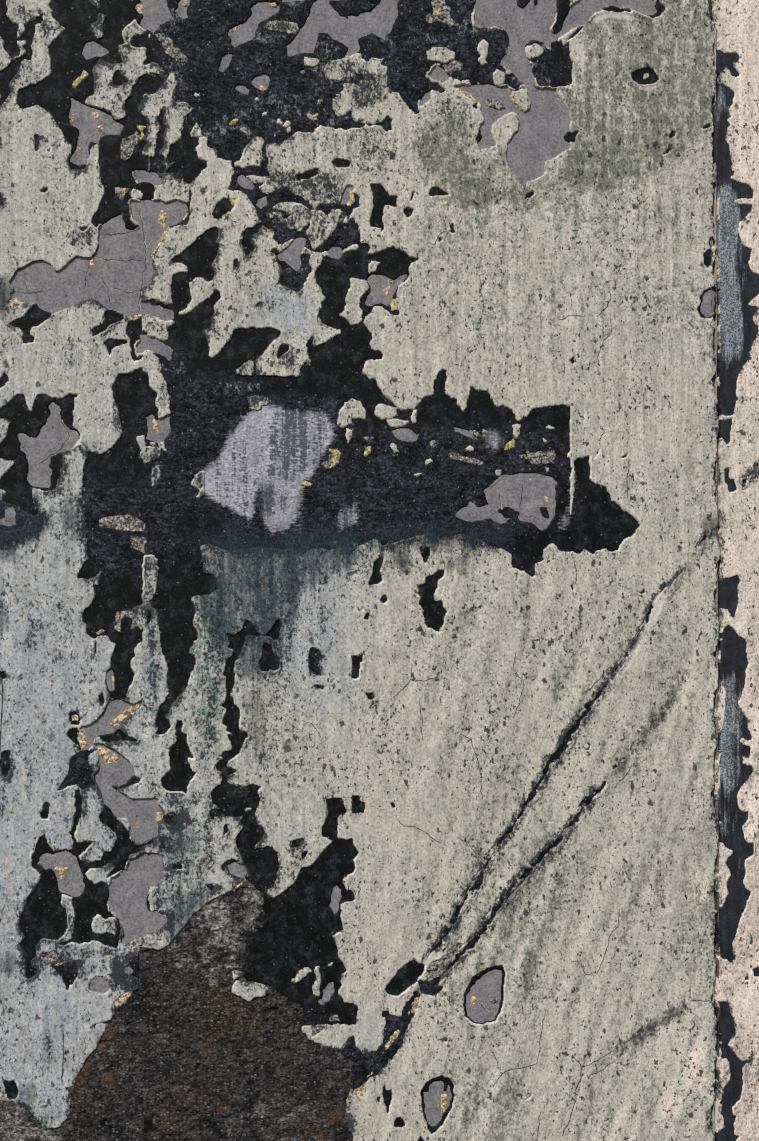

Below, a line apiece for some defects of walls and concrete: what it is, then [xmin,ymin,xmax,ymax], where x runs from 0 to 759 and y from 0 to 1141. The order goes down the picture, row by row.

peeling [697,49,759,444]
peeling [0,0,666,735]
peeling [724,468,746,492]
leakage [201,527,410,673]
spalling [0,584,516,1141]
crack [397,819,484,862]
crack [461,734,484,799]
crack [513,652,525,719]
spalling [498,652,628,845]
peeling [714,575,754,962]
crack [579,910,620,975]
peeling [714,1001,751,1141]